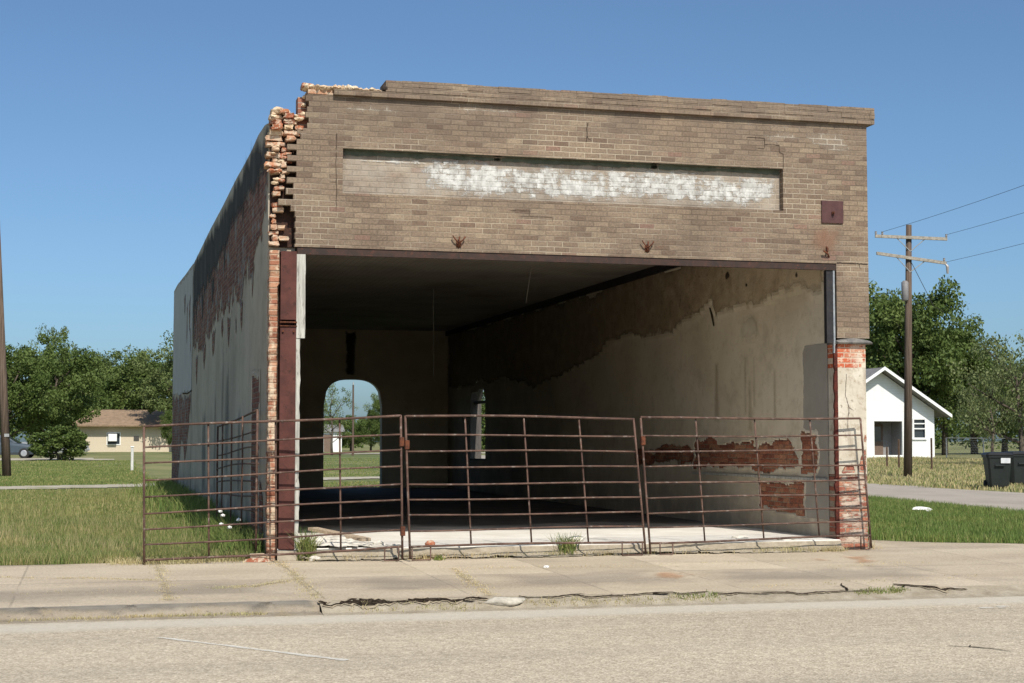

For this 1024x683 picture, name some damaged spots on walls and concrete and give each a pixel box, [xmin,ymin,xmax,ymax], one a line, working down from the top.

crack [750,137,784,168]
flaking render [172,82,388,484]
flaking render [448,266,824,397]
spalling [635,427,820,522]
peeling [841,435,867,544]
crack [317,596,488,609]
crack [519,583,965,598]